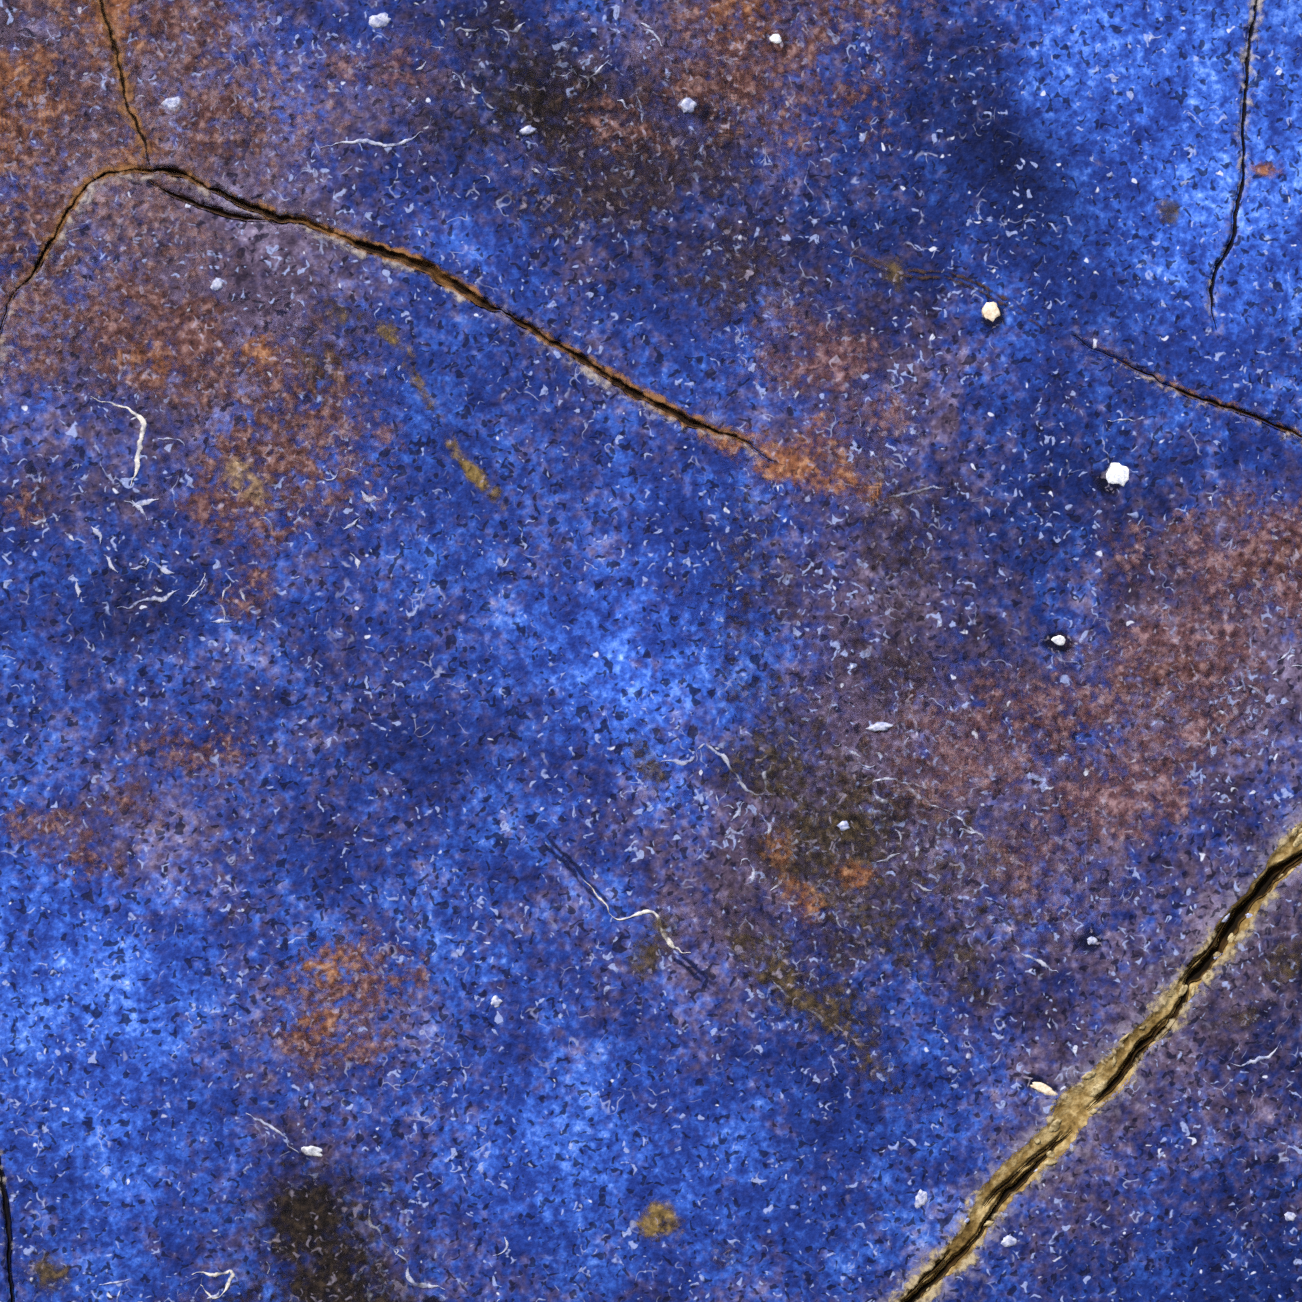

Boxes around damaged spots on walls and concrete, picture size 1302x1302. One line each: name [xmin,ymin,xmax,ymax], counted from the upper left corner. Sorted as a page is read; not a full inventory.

crack [0,0,772,461]
crack [1209,0,1263,329]
crack [850,255,1302,438]
crack [545,838,711,985]
crack [889,822,1302,1302]
crack [0,1165,14,1302]
water stain [228,1157,421,1302]